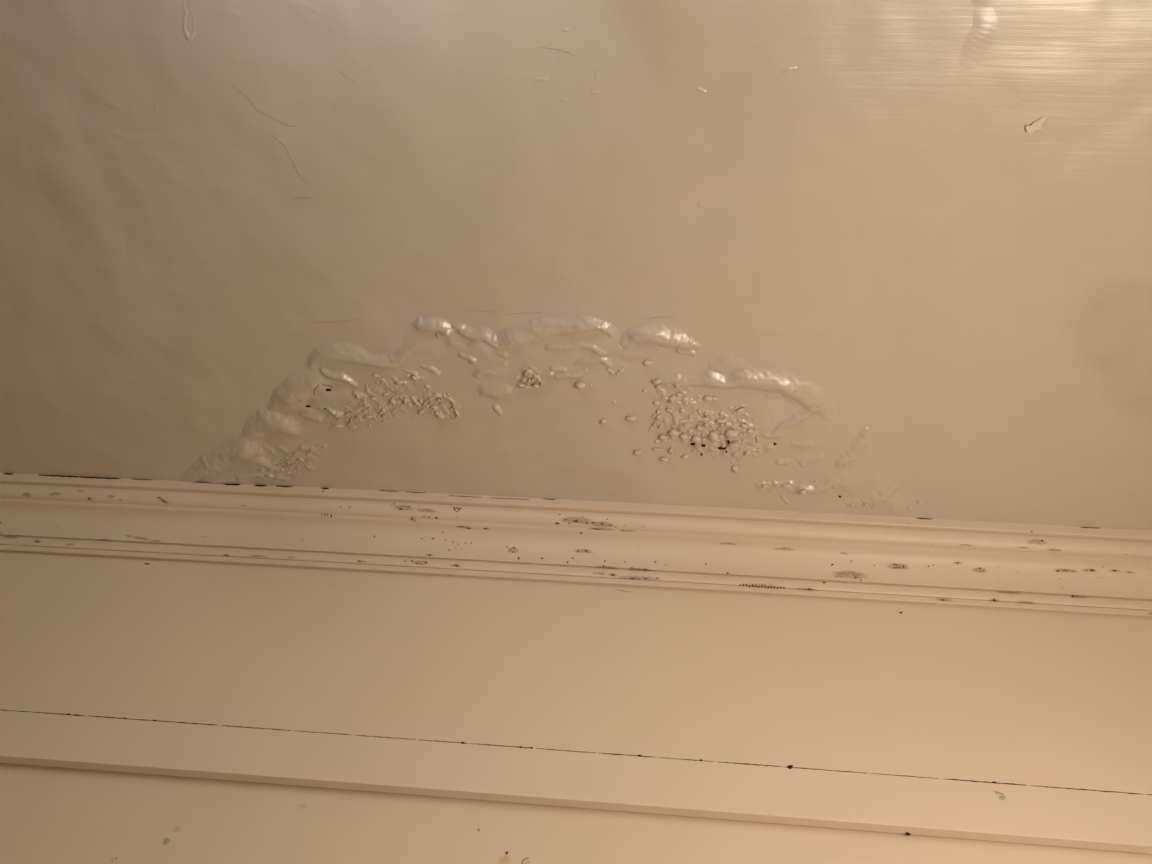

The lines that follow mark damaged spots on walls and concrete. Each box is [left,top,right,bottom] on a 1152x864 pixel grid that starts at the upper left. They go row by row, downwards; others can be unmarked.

flaking render [326,372,462,430]
flaking render [633,378,777,473]